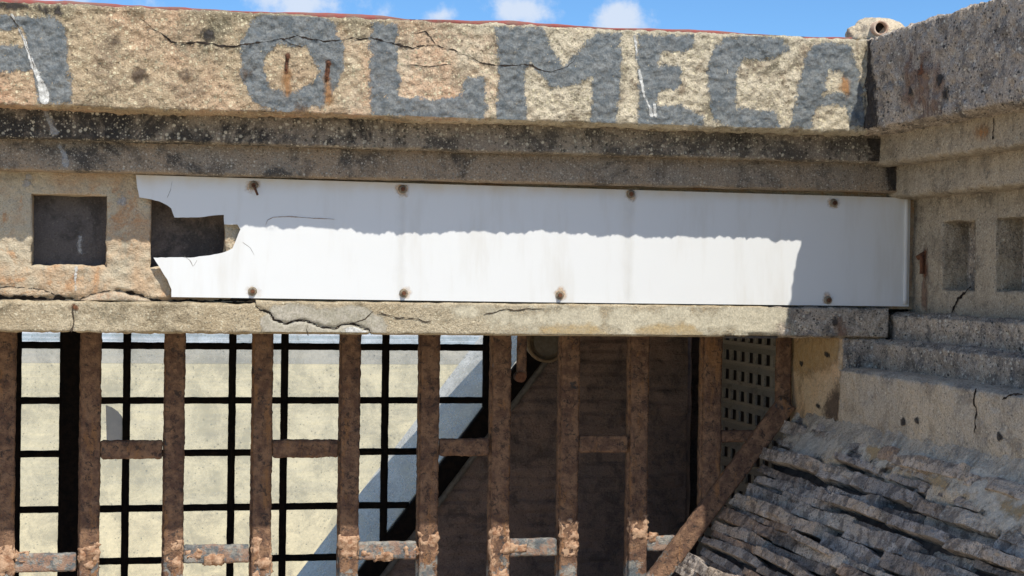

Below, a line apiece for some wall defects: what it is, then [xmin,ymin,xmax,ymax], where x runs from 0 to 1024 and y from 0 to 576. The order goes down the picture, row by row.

crack [140,18,576,72]
corrosion [283,53,291,96]
crack [0,286,431,335]
crack [483,307,542,315]
crack [952,286,971,312]
crack [971,388,979,433]